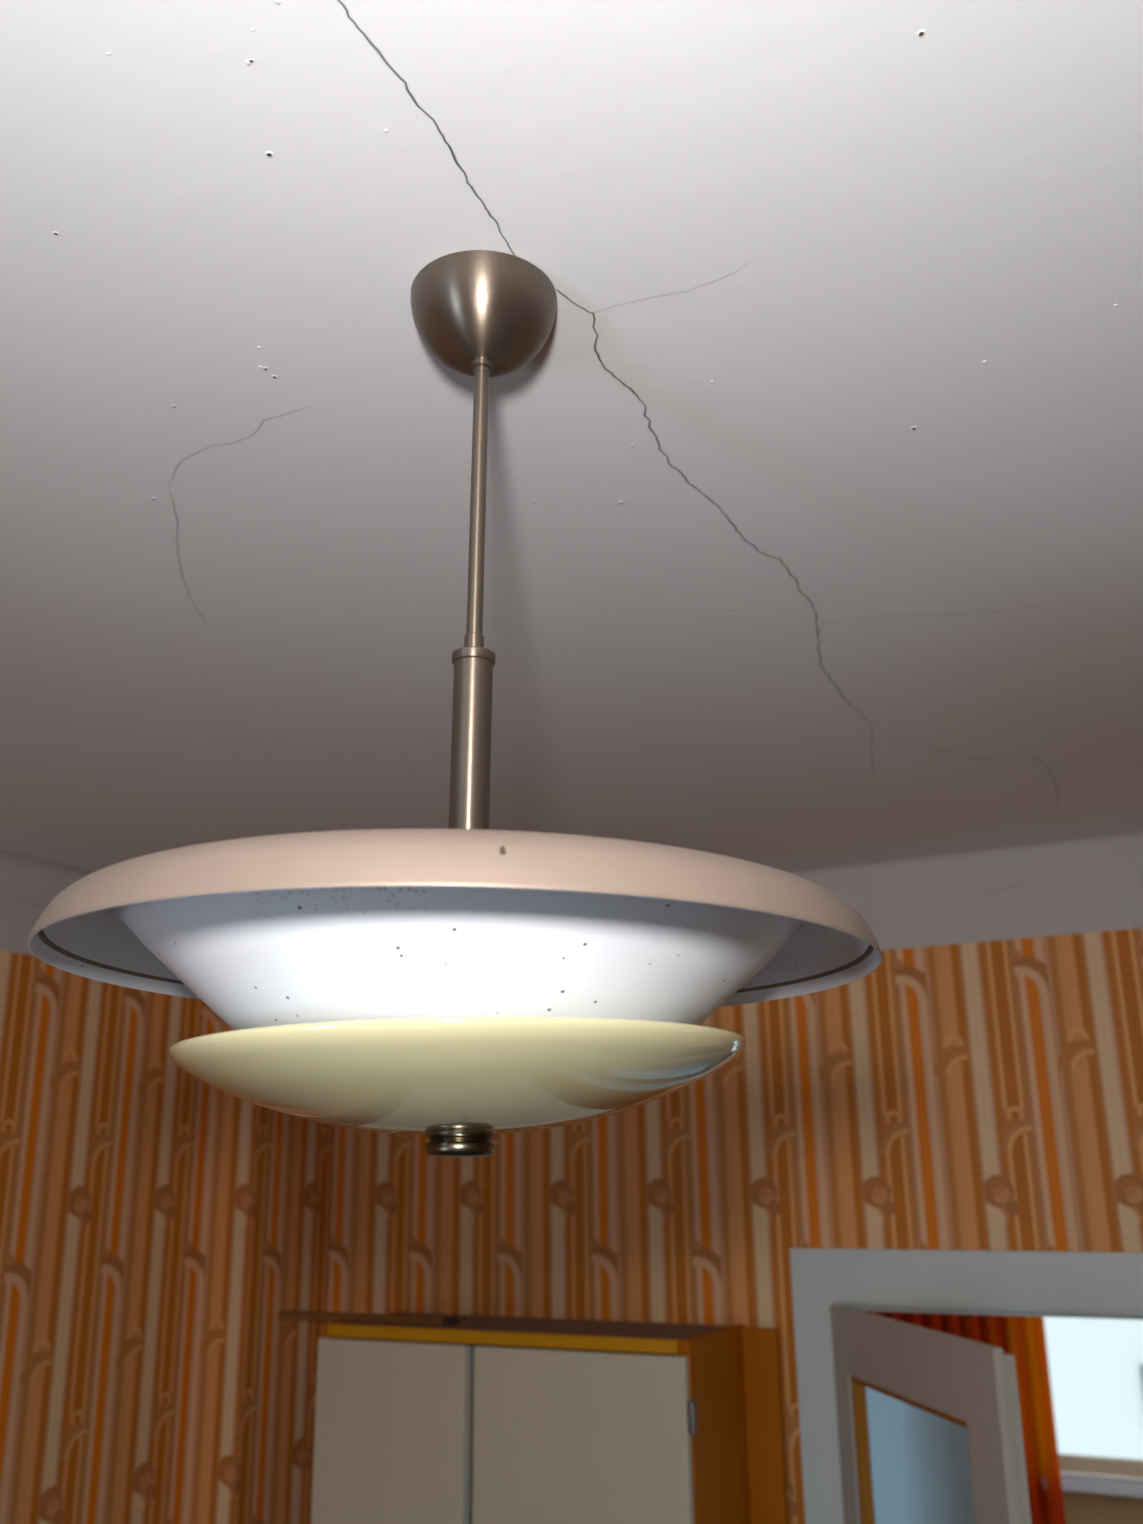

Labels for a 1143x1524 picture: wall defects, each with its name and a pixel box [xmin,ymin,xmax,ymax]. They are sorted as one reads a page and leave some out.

crack [338,0,515,256]
crack [556,289,872,726]